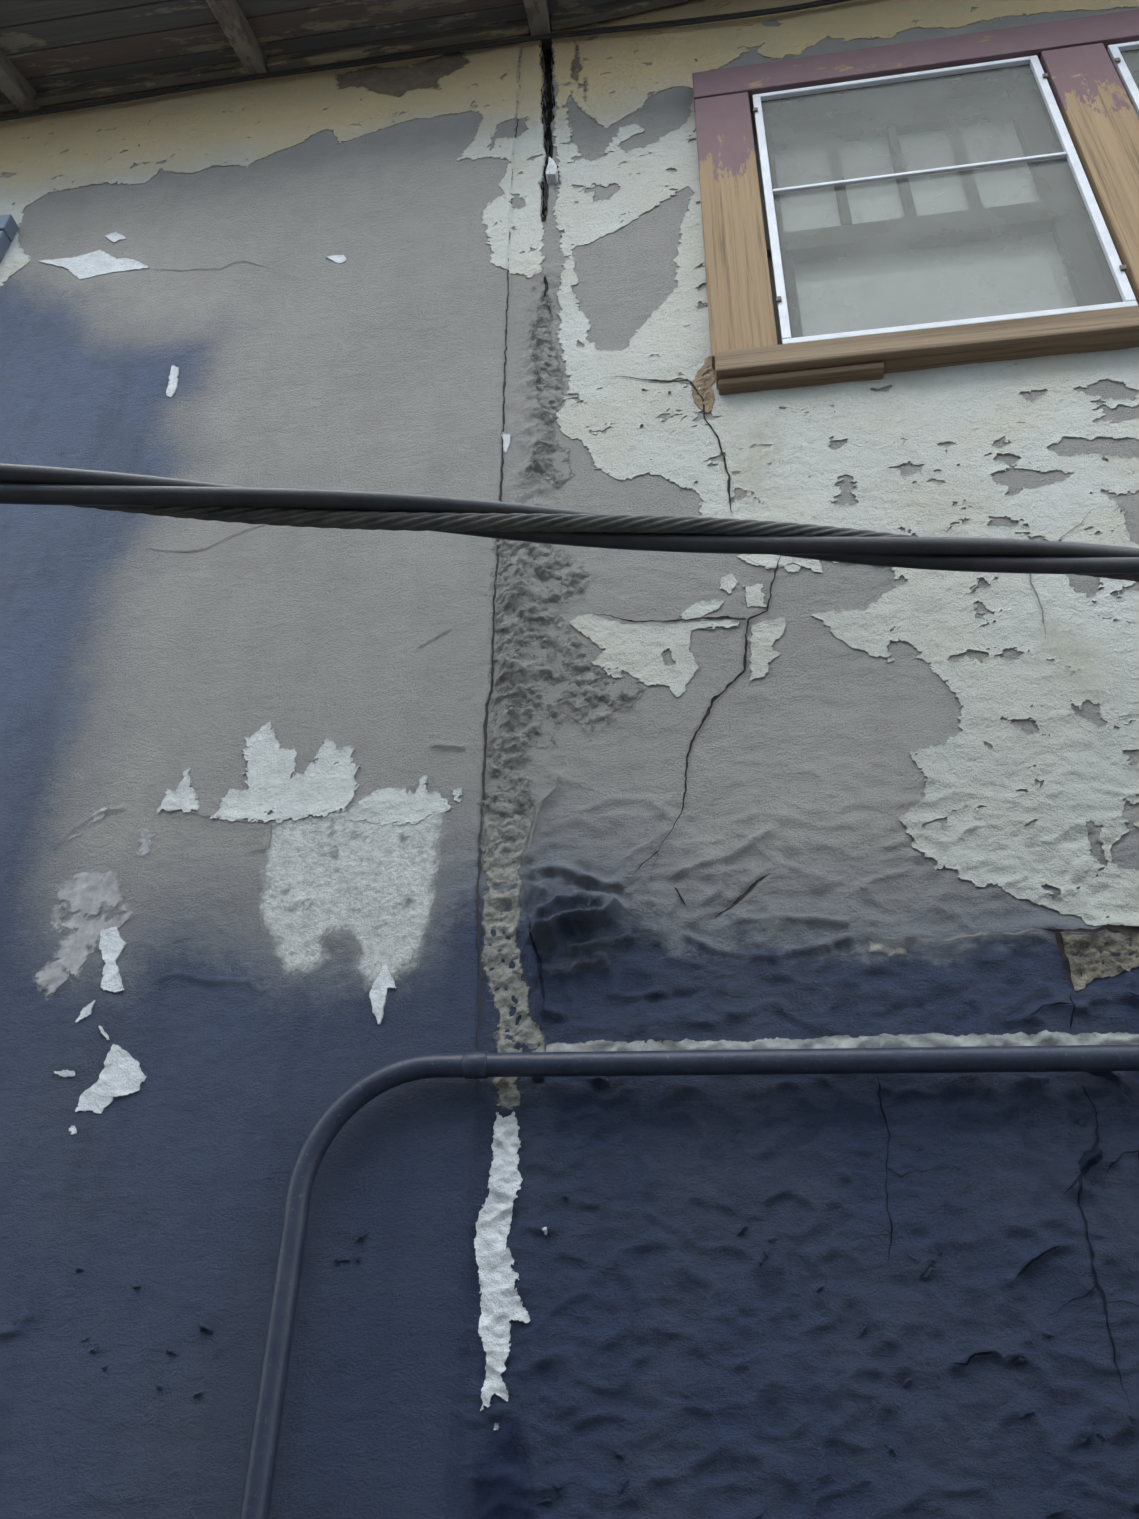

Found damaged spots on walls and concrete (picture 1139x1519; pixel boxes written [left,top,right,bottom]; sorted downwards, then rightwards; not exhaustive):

crack [499,29,560,502]
peeling [0,0,1139,548]
crack [607,376,733,516]
crack [476,539,499,1106]
peeling [157,539,1139,1053]
crack [589,556,781,874]
peeling [35,870,147,1135]
spalling [474,1077,531,1430]
crack [877,1075,916,1280]
crack [954,1351,1018,1366]
crack [1015,1084,1139,1415]